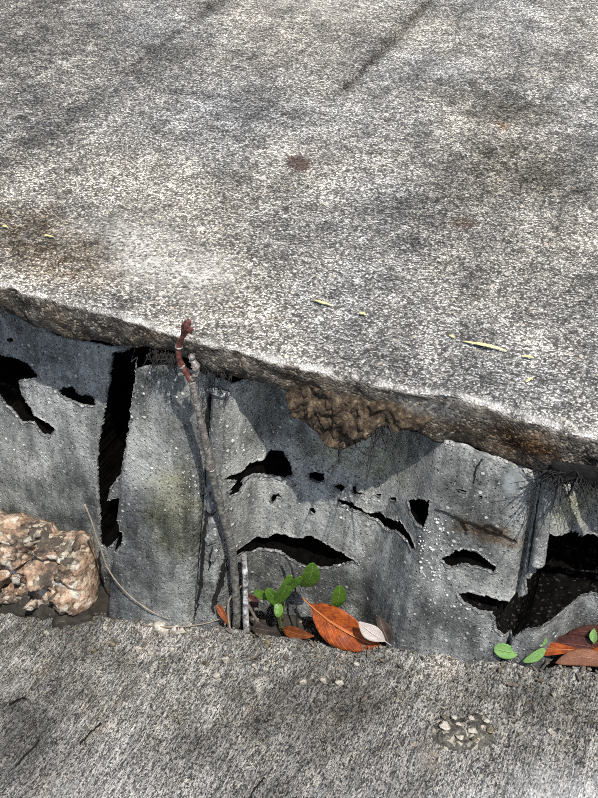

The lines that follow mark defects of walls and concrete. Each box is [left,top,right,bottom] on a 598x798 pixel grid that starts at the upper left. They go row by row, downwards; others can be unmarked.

spalling [0,353,55,438]
spalling [57,347,138,557]
spalling [224,449,296,498]
spalling [239,533,360,570]
spalling [440,547,497,575]
spalling [456,568,598,640]